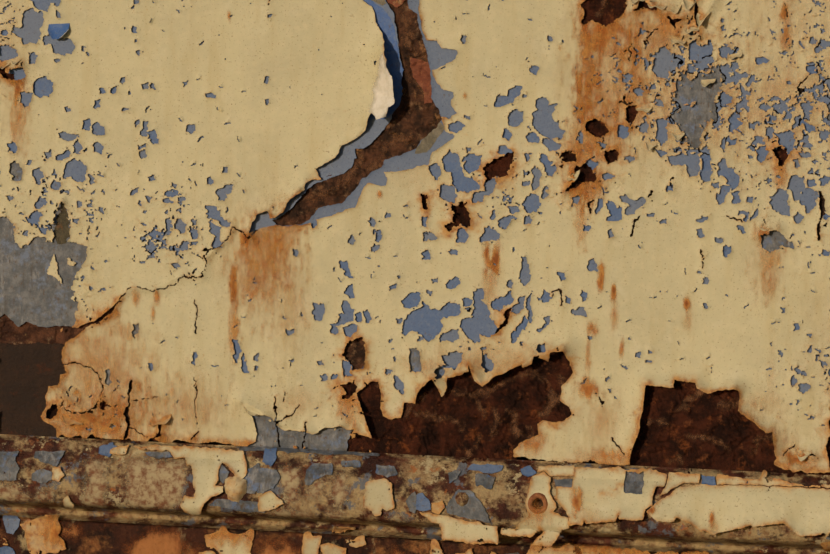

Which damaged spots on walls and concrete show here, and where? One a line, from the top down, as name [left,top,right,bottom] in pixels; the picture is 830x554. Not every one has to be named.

peeling [0,118,105,327]
peeling [249,0,498,235]
rust [445,201,471,232]
rust [483,152,517,183]
peeling [479,85,615,243]
rust [559,0,657,211]
peeling [617,0,759,234]
crack [124,380,158,441]
crack [273,394,307,448]
rust [335,347,574,464]
rust [630,380,830,478]
peeling [420,465,830,554]